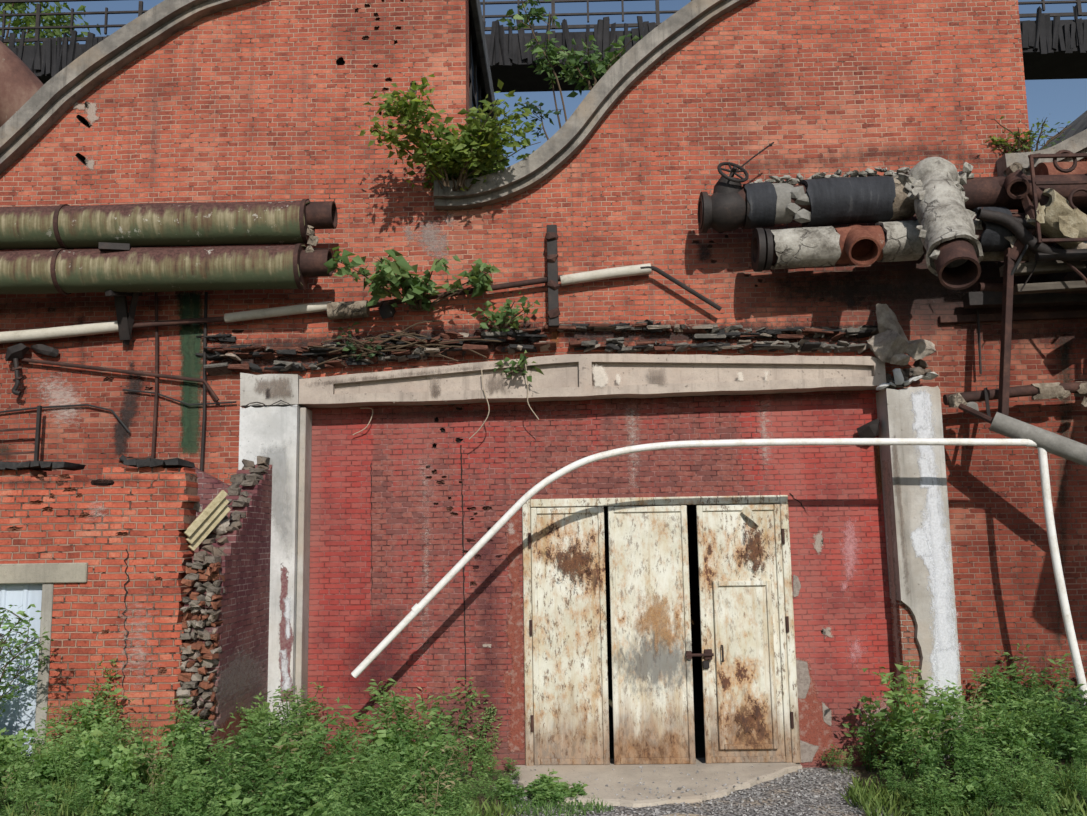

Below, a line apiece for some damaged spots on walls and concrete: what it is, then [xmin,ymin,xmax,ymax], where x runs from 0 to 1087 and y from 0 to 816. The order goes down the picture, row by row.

leakage [115,418,129,455]
rust [545,533,597,592]
peeling [195,298,961,765]
rust [736,522,774,580]
crack [122,549,130,713]
rust [636,596,678,652]
rust [726,701,770,740]